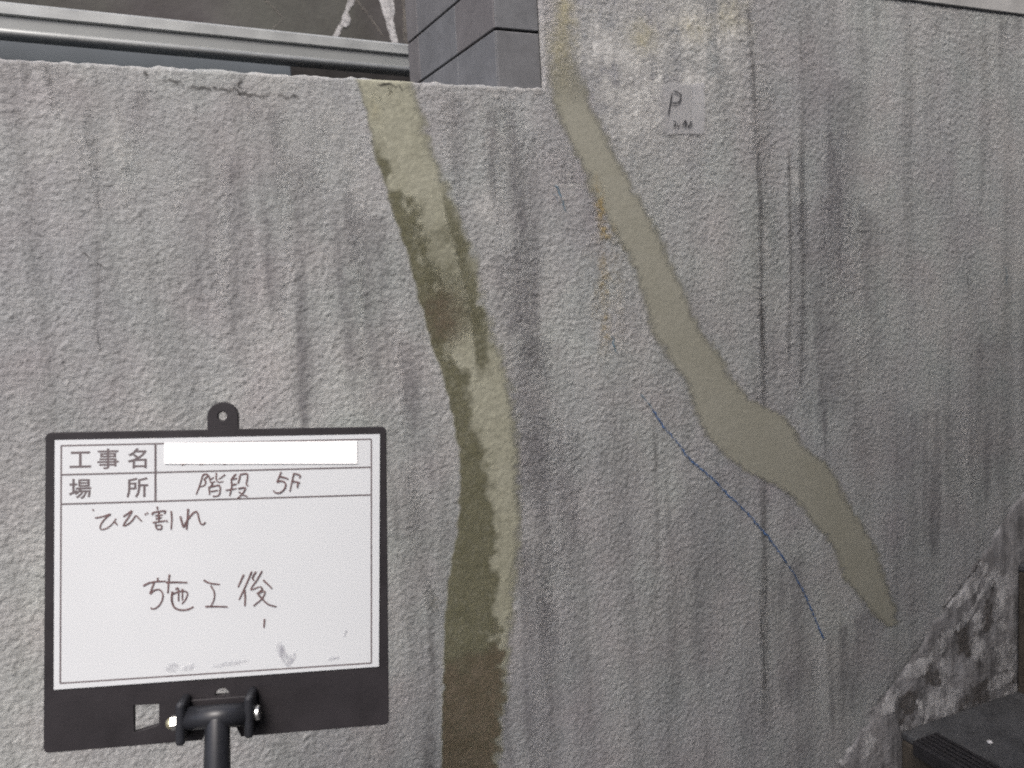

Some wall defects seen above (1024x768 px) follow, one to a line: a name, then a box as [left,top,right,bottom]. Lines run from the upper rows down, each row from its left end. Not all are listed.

water stain [378,157,390,176]
water stain [389,191,504,768]